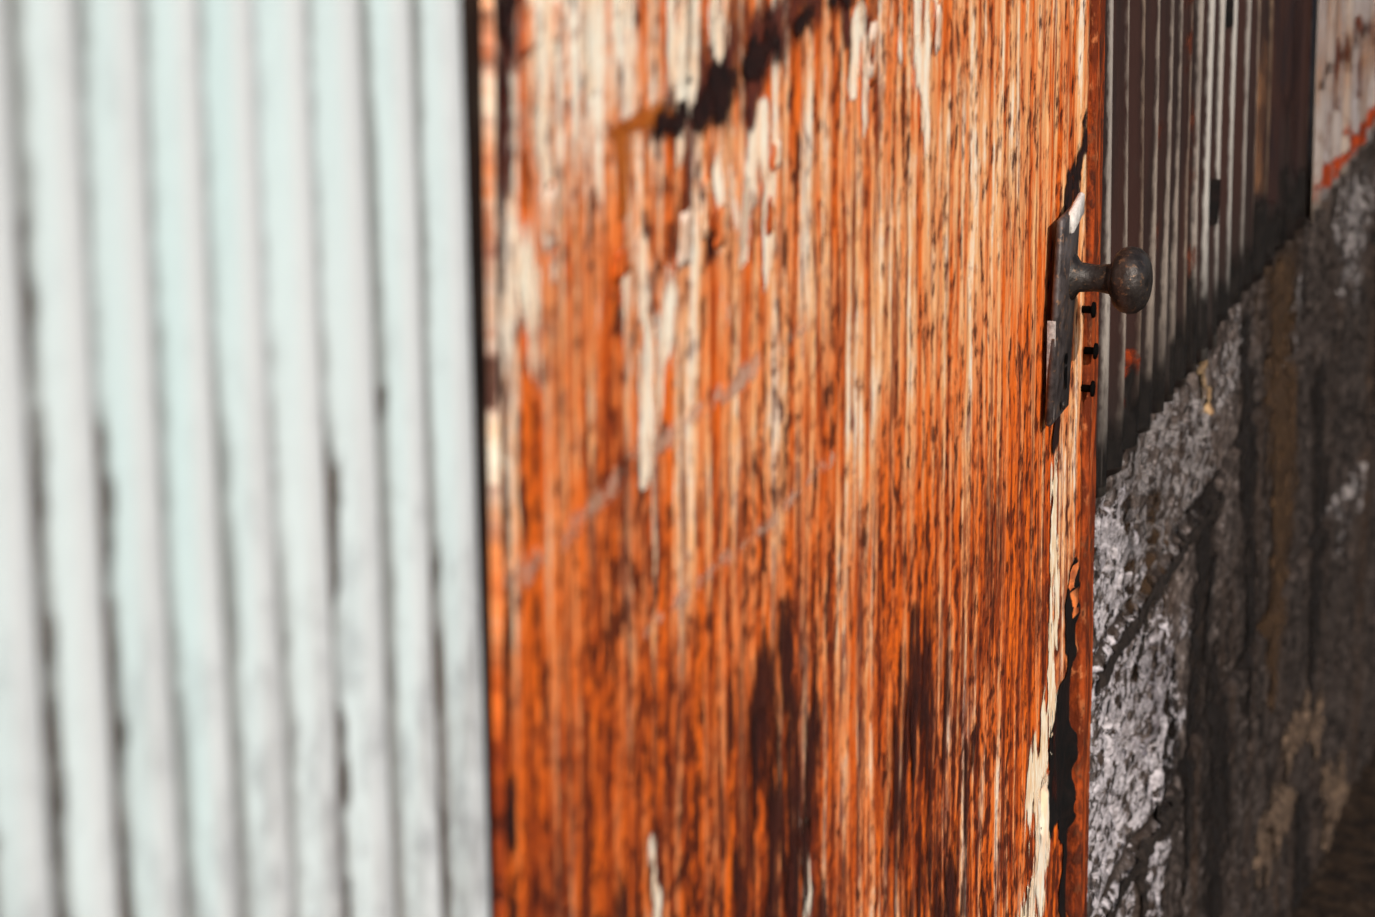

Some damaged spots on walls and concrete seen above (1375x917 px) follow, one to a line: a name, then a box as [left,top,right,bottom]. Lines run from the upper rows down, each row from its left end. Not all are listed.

peeling [510,0,564,385]
peeling [667,0,729,169]
peeling [616,97,782,491]
rust [608,0,874,224]
peeling [847,0,878,138]
peeling [898,0,942,158]
rust [1064,110,1088,213]
rust [1314,16,1375,197]
rust [495,0,518,917]
rust [728,600,829,917]
rust [884,601,993,917]
peeling [1020,459,1060,917]